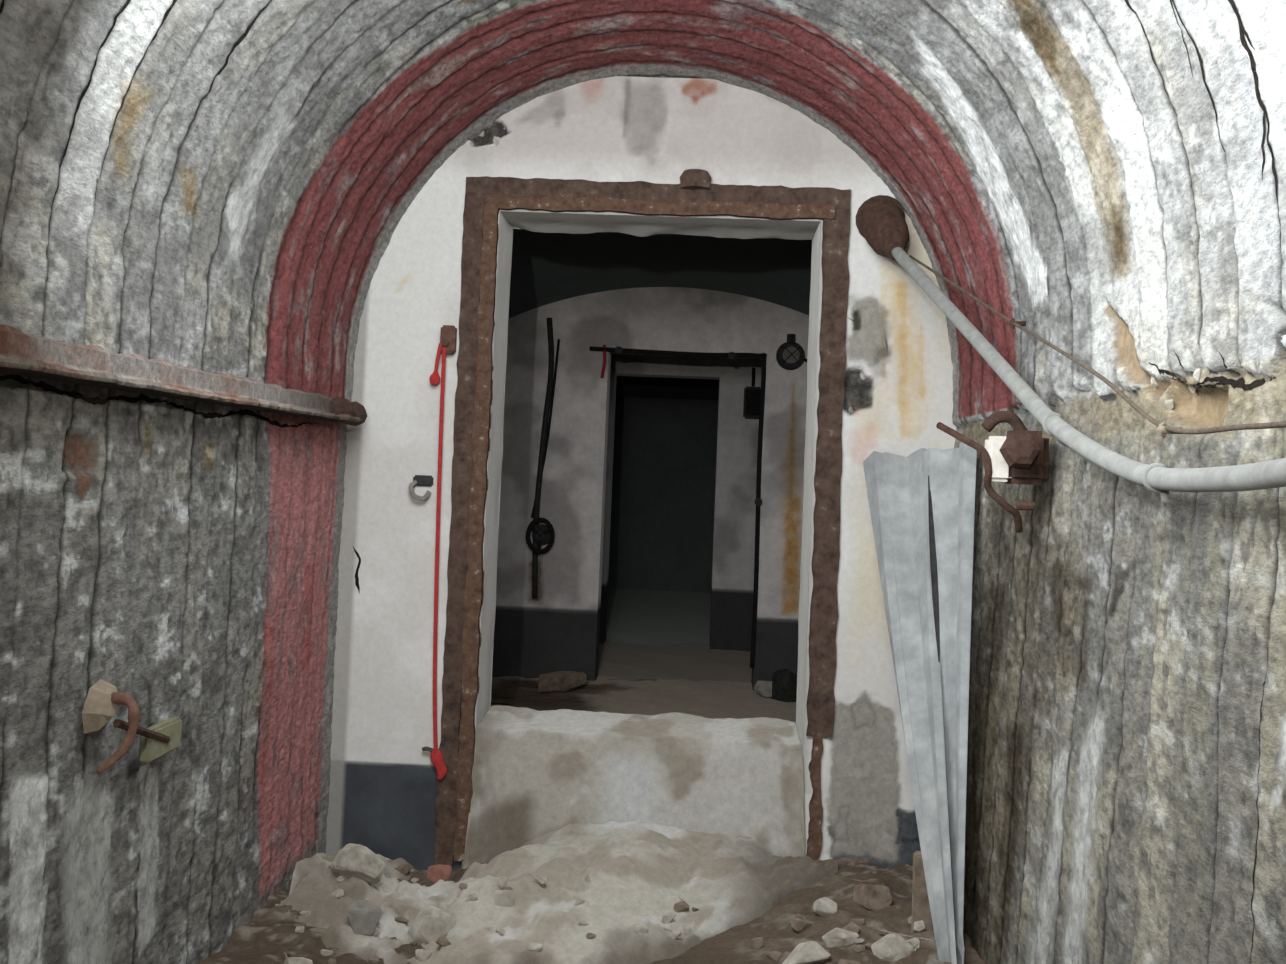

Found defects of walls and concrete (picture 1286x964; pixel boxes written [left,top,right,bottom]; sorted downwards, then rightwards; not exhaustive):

flaking render [843,298,889,414]
spalling [1106,303,1229,428]
flaking render [829,694,921,869]